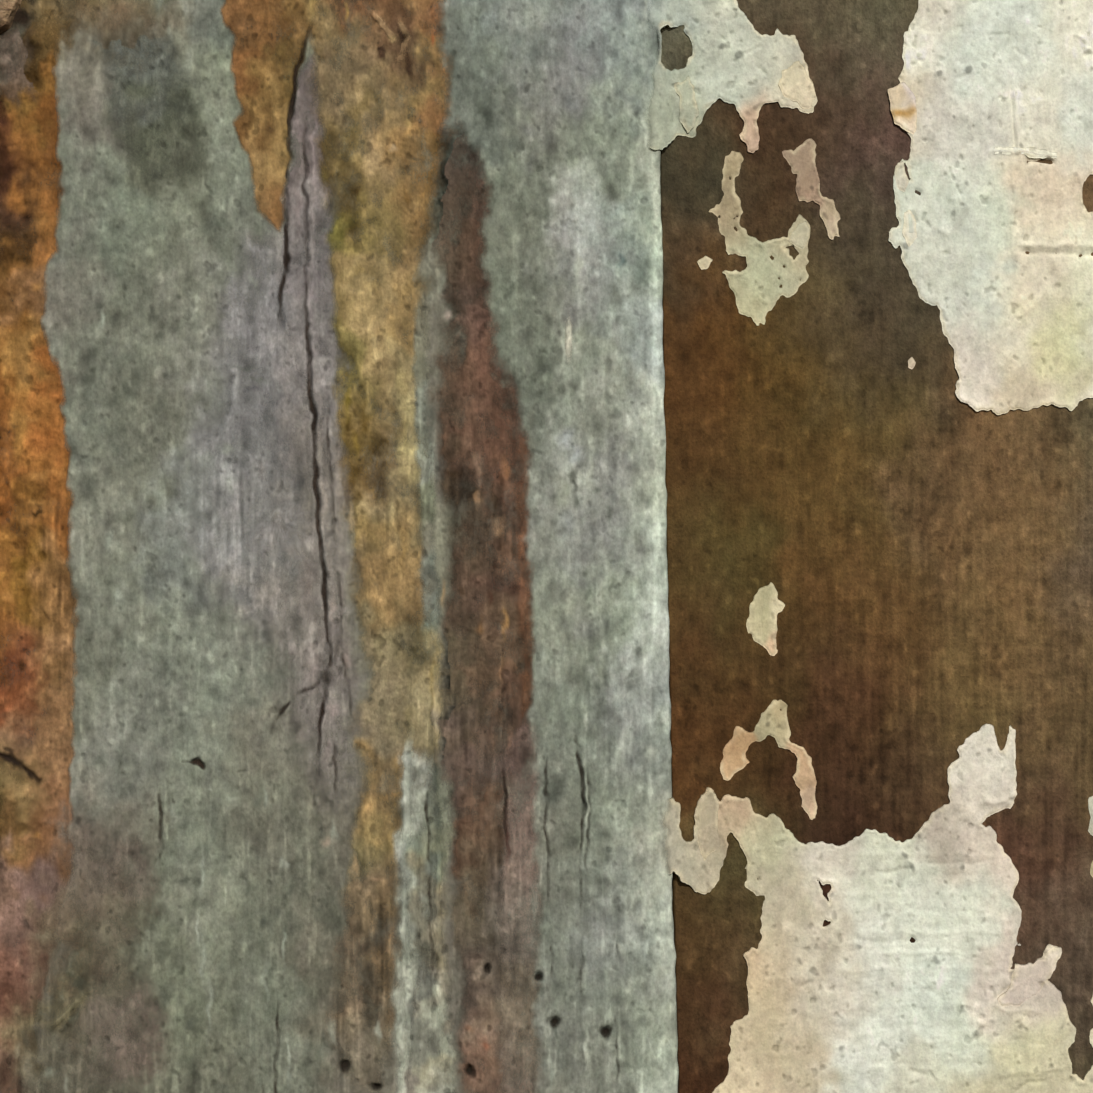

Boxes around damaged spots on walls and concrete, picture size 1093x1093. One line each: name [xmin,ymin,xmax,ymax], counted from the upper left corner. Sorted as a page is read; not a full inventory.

crack [278,225,307,311]
crack [286,41,305,177]
peeling [648,0,841,326]
peeling [887,0,1093,415]
corrosion [0,0,159,1093]
crack [280,687,336,772]
crack [306,324,344,665]
corrosion [221,0,538,1093]
peeling [746,582,785,656]
peeling [720,699,817,820]
peeling [663,724,1093,1093]